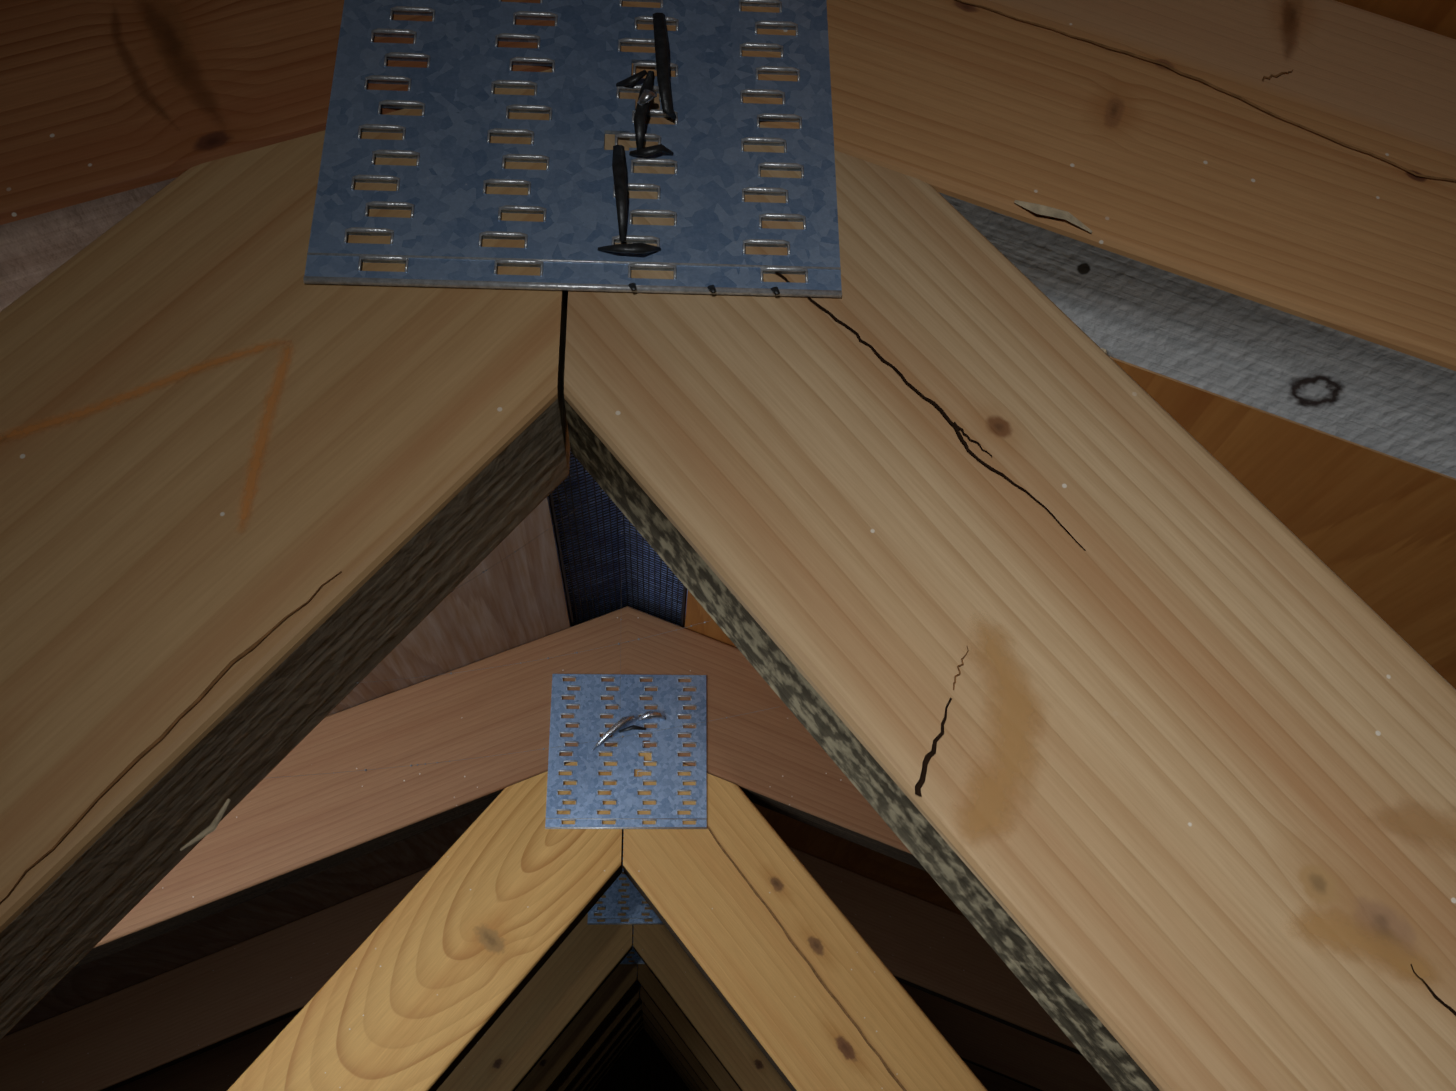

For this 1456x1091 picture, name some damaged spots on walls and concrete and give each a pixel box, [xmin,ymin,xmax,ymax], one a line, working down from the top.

crack [957,0,1456,182]
crack [775,272,1086,551]
crack [915,646,969,797]
crack [1410,964,1456,1015]